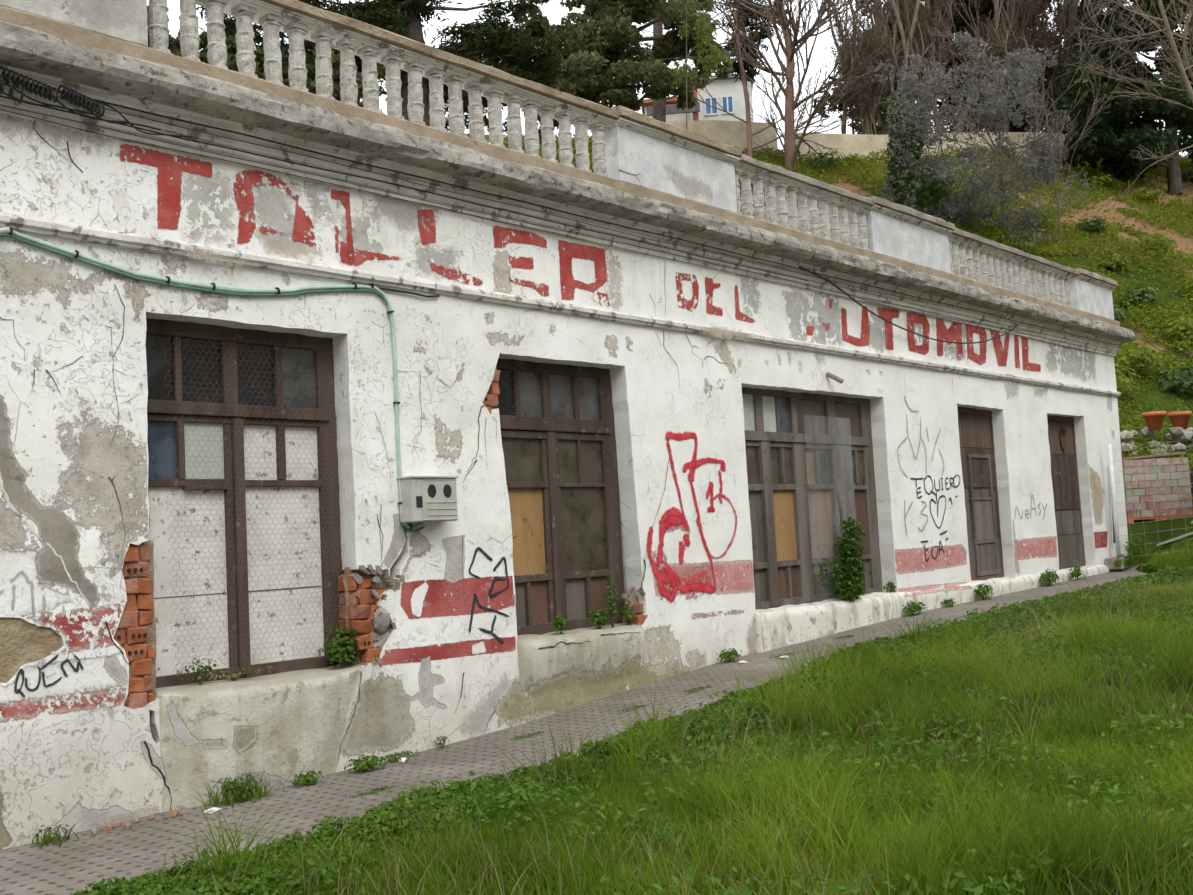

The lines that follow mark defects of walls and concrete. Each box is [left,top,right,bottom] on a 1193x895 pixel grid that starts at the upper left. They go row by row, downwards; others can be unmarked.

crack [0,317,83,396]
crack [105,285,137,445]
crack [108,476,126,551]
peeling [0,394,156,709]
peeling [334,514,465,763]
peeling [140,741,166,778]
crack [144,741,172,811]
peeling [0,792,12,850]
peeling [55,802,139,836]